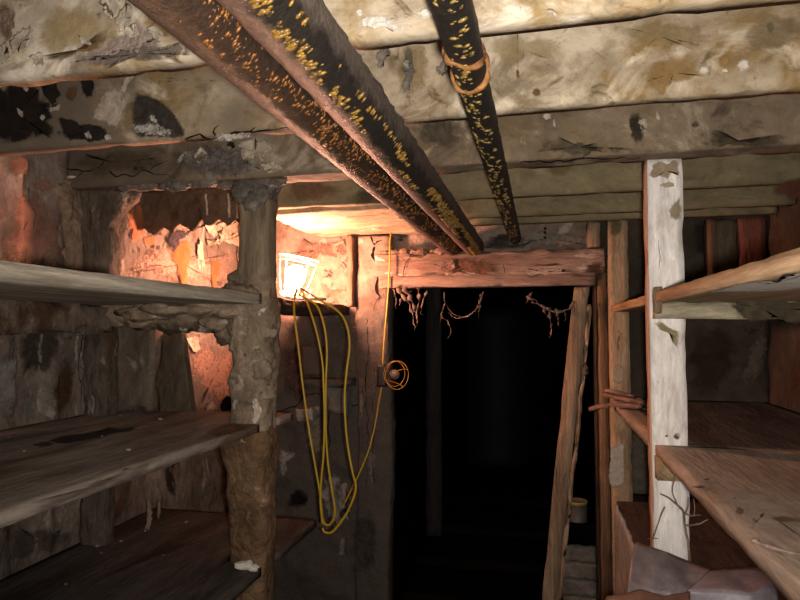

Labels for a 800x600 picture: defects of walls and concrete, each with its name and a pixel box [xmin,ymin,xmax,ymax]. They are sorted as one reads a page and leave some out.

spalling [0,6,45,67]
spalling [78,0,169,63]
crack [67,156,175,178]
spalling [133,95,184,138]
crack [185,125,287,140]
rust [197,0,482,256]
rust [432,0,517,243]
crack [520,153,638,163]
peeling [650,160,679,187]
flaking render [134,137,282,285]